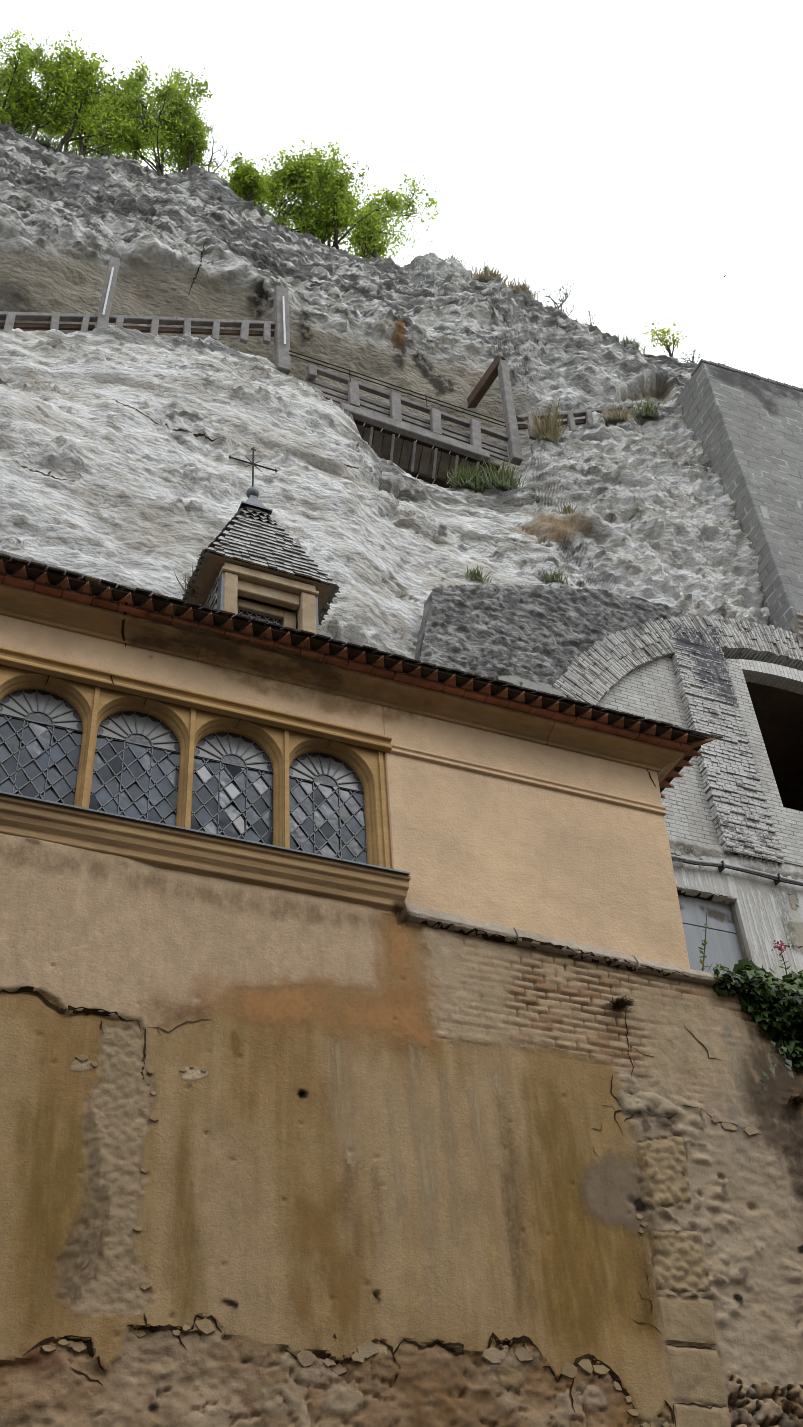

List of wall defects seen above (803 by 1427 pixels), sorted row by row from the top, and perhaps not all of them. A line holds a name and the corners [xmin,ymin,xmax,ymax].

crack [0,986,211,1086]
flaking render [57,1021,159,1315]
damp [570,1155,654,1325]
damp [732,1034,803,1192]
flaking render [262,1367,363,1415]
flaking render [576,1384,607,1410]